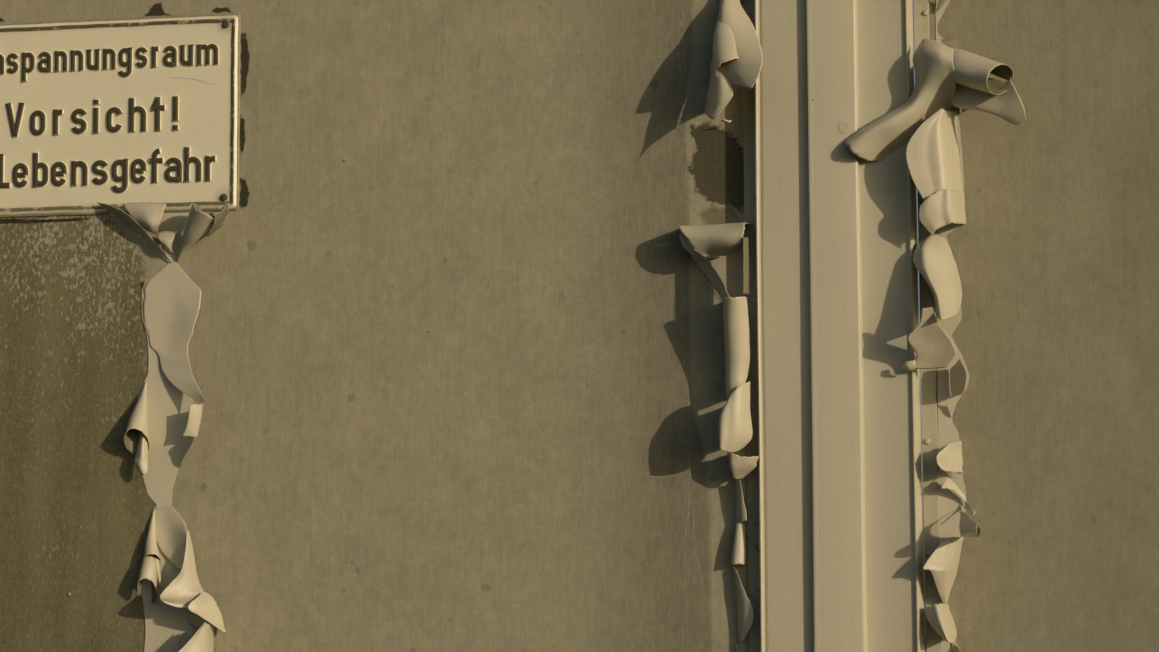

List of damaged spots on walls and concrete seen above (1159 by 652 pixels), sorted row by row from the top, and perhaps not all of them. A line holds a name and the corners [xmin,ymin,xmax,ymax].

peeling [704,0,763,123]
peeling [97,202,229,652]
peeling [677,222,760,652]
peeling [845,0,1026,652]